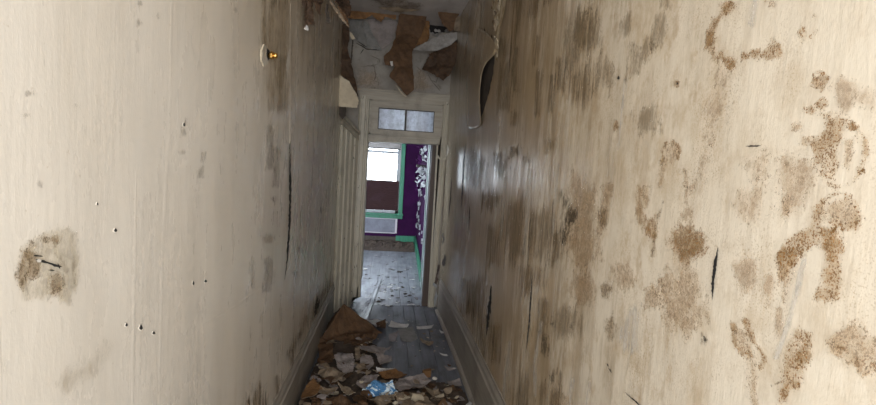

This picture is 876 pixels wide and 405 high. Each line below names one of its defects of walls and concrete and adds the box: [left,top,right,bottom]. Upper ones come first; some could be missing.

spalling [429,25,449,37]
damp [15,237,59,292]
crack [710,248,719,299]